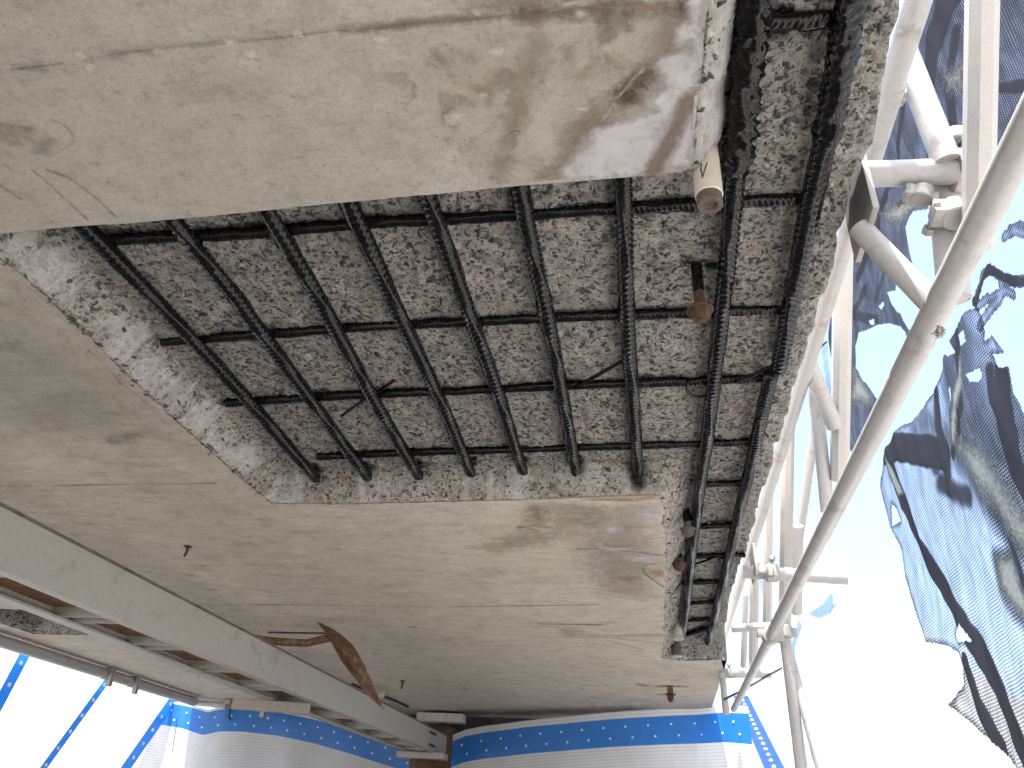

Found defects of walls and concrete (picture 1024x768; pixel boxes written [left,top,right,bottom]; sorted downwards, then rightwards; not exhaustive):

spalling [0,0,899,661]
leakage [345,0,703,180]